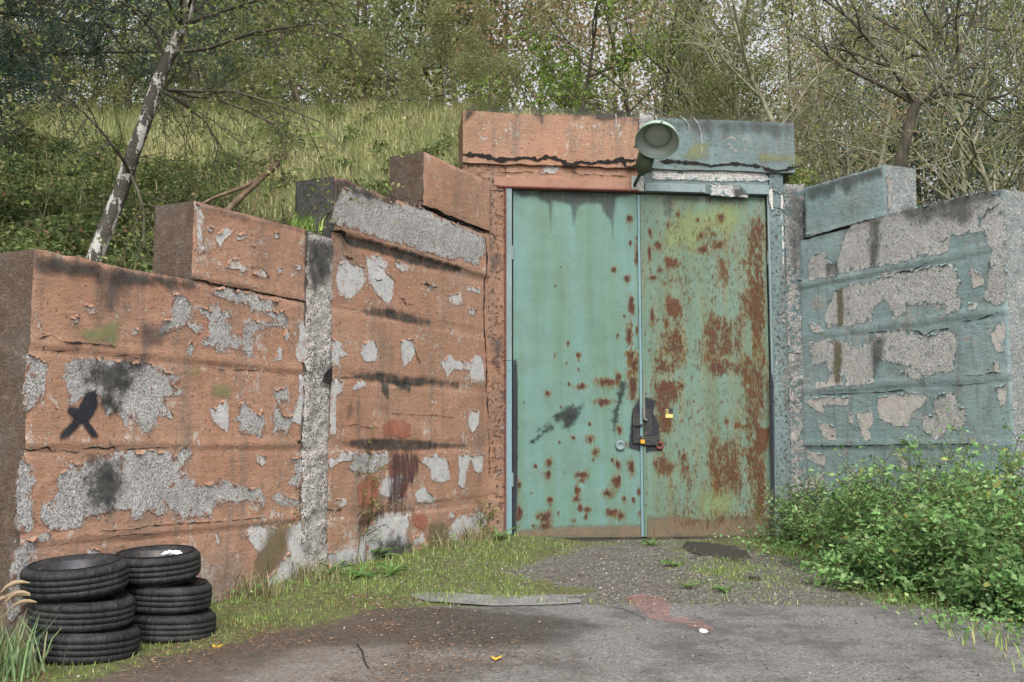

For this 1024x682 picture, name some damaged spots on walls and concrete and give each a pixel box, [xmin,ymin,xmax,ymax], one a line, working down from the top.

crack [462,151,801,210]
peeling [194,201,247,254]
peeling [159,281,306,439]
peeling [328,337,379,435]
peeling [400,338,416,367]
peeling [440,354,486,384]
rust [594,212,769,530]
spalling [804,174,1011,489]
peeling [468,408,479,433]
peeling [5,353,304,621]
rust [532,497,559,530]
rust [573,471,591,521]